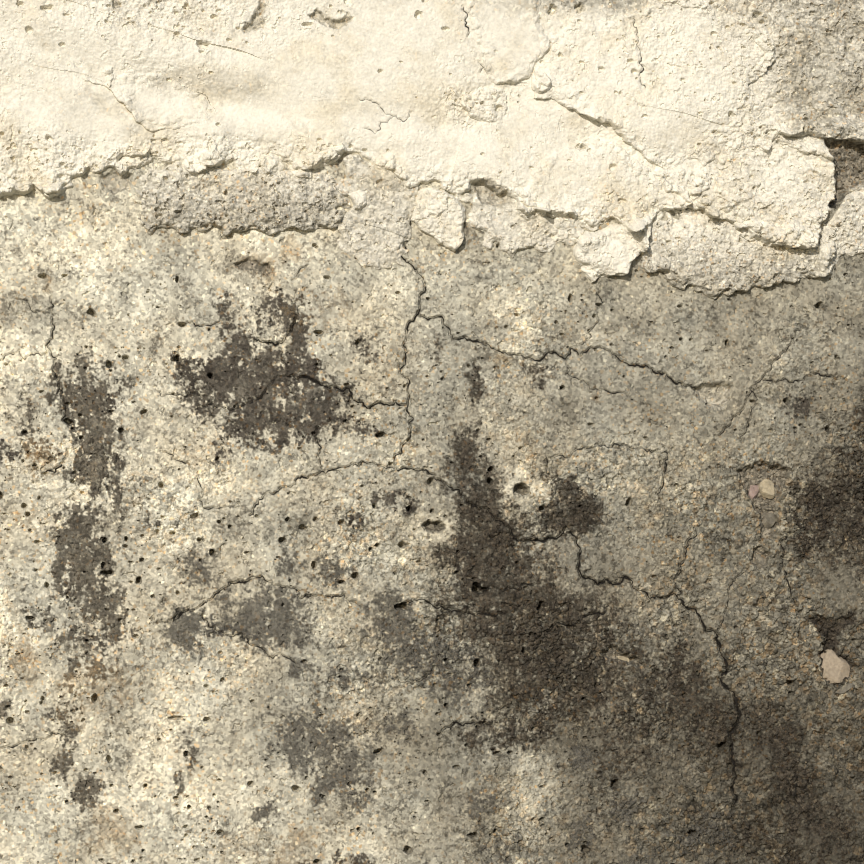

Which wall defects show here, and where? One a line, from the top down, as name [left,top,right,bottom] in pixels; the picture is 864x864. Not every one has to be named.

peeling [0,178,73,199]
peeling [84,0,864,299]
damp [170,287,379,466]
damp [464,346,485,407]
damp [522,358,555,390]
crack [718,330,844,439]
crack [155,221,748,806]
damp [160,422,858,864]
crack [780,534,795,603]
damp [786,392,864,587]